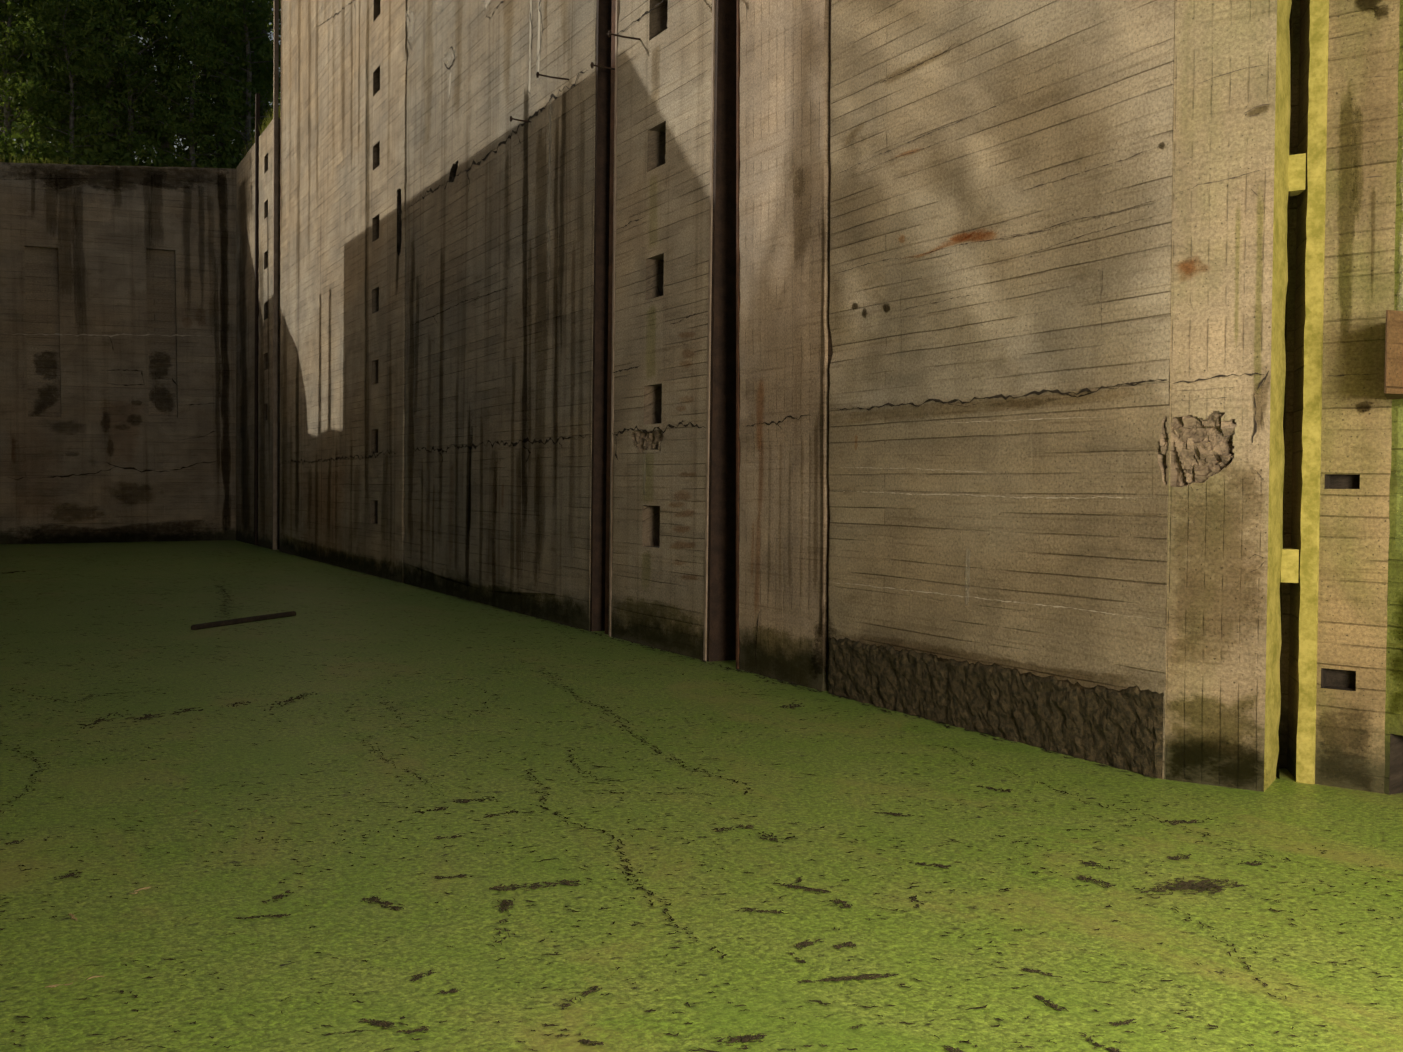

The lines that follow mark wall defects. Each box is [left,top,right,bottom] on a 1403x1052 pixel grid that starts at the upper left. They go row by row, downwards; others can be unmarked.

leakage [15,165,231,530]
crack [743,373,1262,427]
crack [279,420,704,470]
spalling [628,423,666,457]
spalling [1152,371,1269,496]